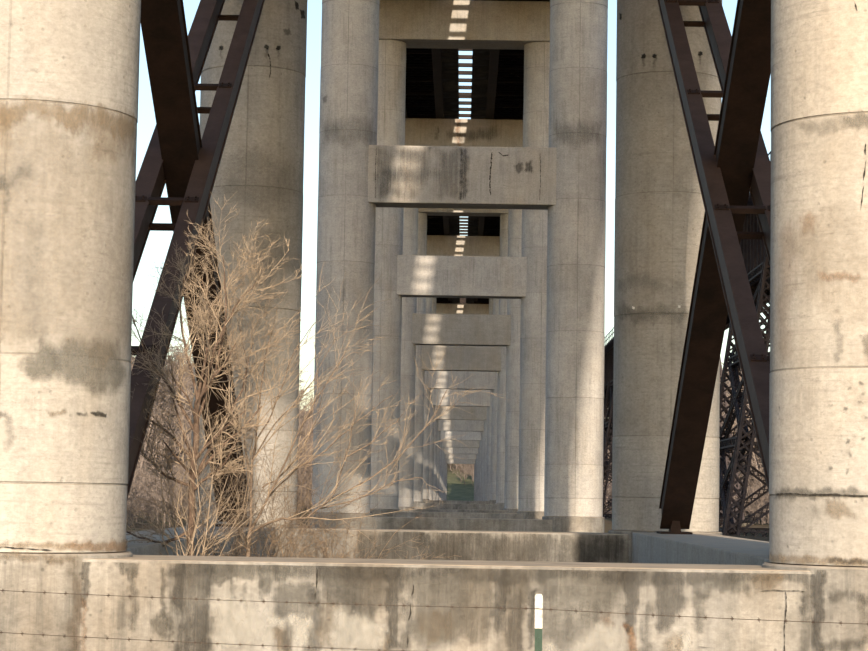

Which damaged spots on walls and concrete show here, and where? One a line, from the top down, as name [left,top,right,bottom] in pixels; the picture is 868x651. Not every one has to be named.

water stain [0,102,135,136]
crack [859,144,867,211]
water stain [26,340,124,392]
water stain [779,488,832,499]
water stain [161,563,321,651]
water stain [333,532,749,651]
water stain [761,554,862,651]